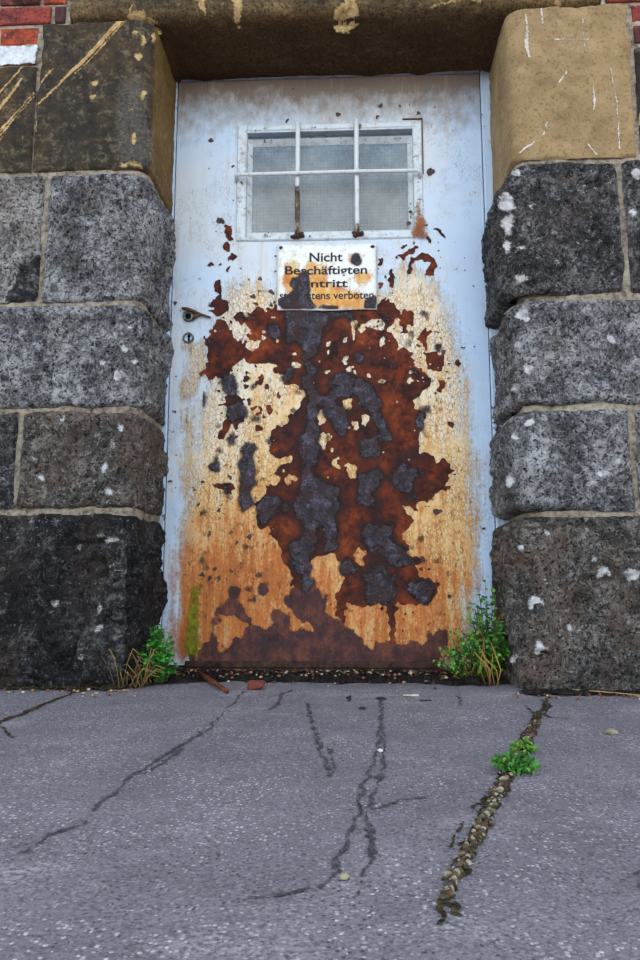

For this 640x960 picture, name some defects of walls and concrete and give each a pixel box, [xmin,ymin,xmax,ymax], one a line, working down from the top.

corrosion [411,202,428,239]
peeling [192,473,236,494]
corrosion [170,253,479,693]
peeling [199,217,475,645]
crack [0,690,81,738]
crack [14,691,247,854]
crack [249,689,432,898]
crack [435,696,562,925]